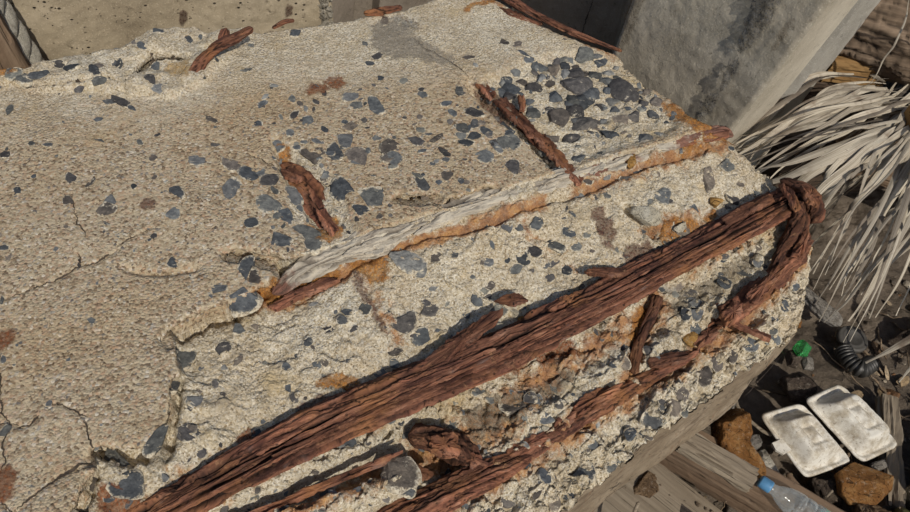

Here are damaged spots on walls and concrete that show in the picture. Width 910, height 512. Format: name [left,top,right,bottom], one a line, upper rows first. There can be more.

spalling [0,27,249,108]
rust [168,26,253,74]
rust [464,0,622,52]
crack [10,203,147,298]
spalling [72,0,781,512]
rust [257,83,734,331]
rust [96,177,826,512]
rust [0,465,16,503]
crack [0,373,103,512]